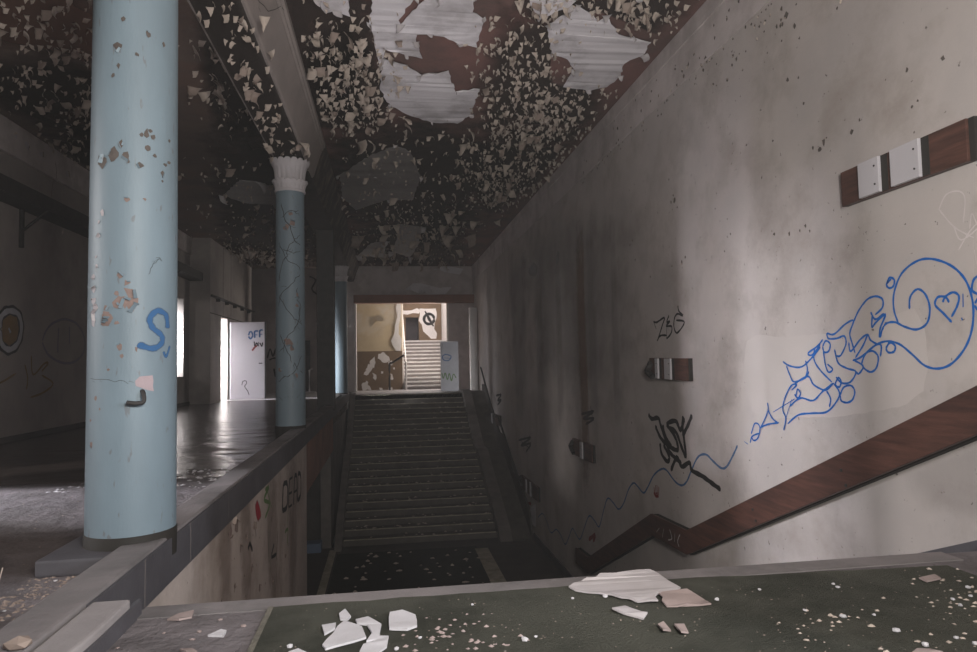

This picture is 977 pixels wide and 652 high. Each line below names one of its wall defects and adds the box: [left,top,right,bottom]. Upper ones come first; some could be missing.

peeling [0,0,144,170]
peeling [139,128,171,183]
peeling [178,0,316,269]
peeling [90,255,139,327]
peeling [362,304,437,390]